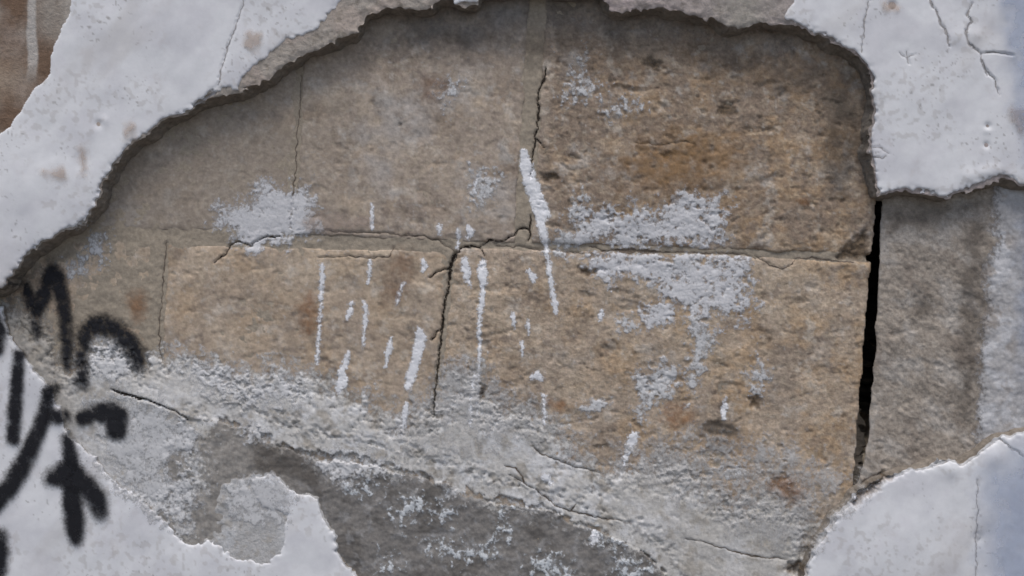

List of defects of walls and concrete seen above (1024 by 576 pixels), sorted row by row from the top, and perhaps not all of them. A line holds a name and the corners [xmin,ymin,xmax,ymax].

crack [929,0,1010,94]
crack [214,76,302,263]
spalling [0,0,516,347]
crack [530,68,547,175]
peeling [74,336,207,535]
crack [112,389,188,420]
peeling [168,359,311,452]
peeling [309,360,582,489]
crack [319,201,882,485]
peeling [532,0,1024,576]
peeling [217,473,299,528]